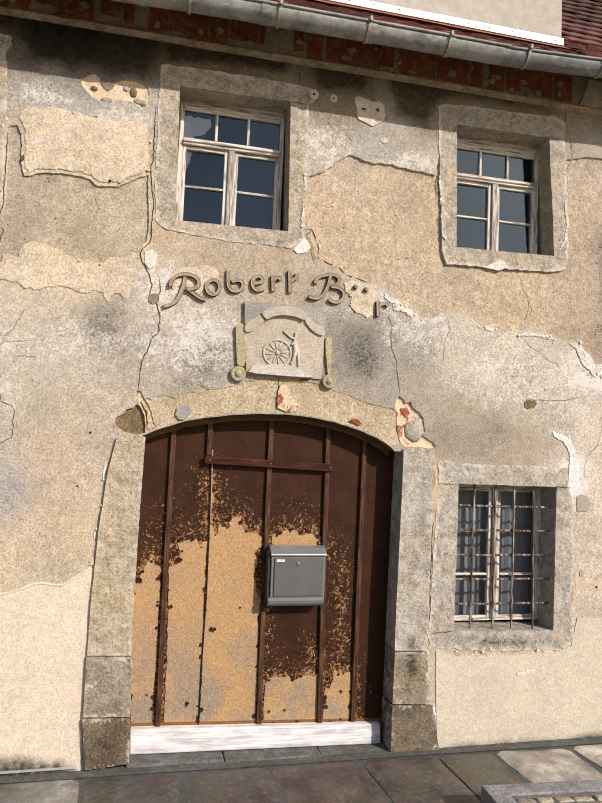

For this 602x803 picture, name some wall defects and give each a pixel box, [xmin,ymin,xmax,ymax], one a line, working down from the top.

spalling [81,74,150,107]
flaking render [0,0,265,45]
flaking render [294,30,572,102]
crack [0,135,8,241]
spalling [0,106,152,302]
crack [134,106,161,389]
spalling [301,155,602,378]
spalling [115,379,445,513]
peeling [553,431,582,497]
water stain [0,761,69,776]